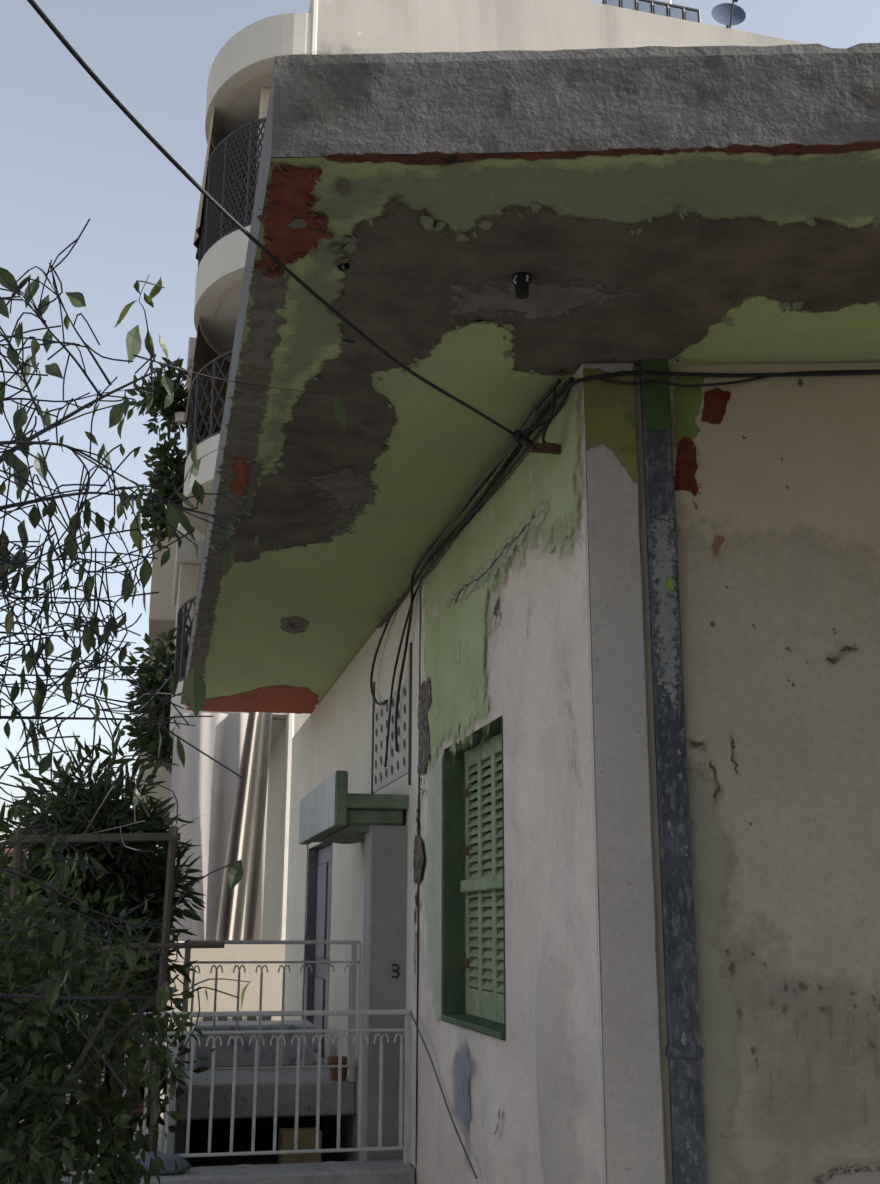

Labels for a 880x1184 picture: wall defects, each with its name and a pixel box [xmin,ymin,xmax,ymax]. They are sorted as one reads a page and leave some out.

corrosion [185,685,319,714]
spalling [186,162,360,681]
peeling [413,360,731,1021]
spalling [825,645,858,664]